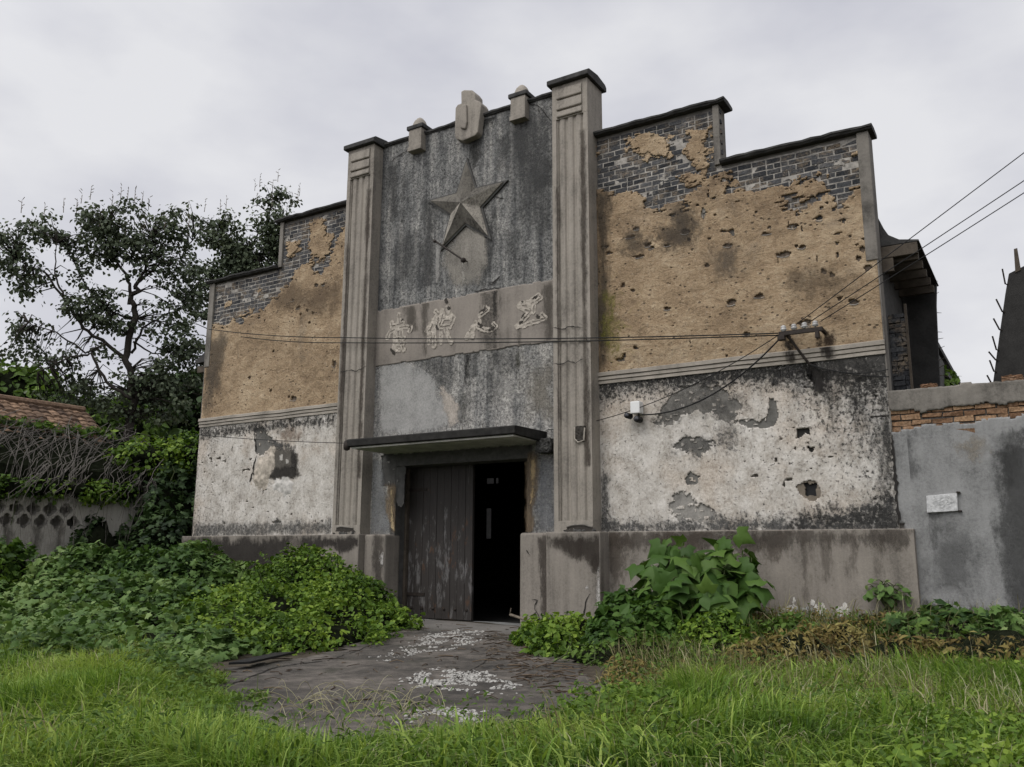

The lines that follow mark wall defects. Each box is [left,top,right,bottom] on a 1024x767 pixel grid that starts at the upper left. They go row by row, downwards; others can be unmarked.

water stain [469,116,495,167]
peeling [597,109,860,245]
water stain [497,112,561,340]
peeling [214,209,346,329]
water stain [537,130,908,615]
spalling [255,427,274,455]
peeling [673,436,716,458]
peeling [653,382,779,432]
spalling [891,401,1024,433]
peeling [669,471,716,524]
spalling [796,480,821,501]
water stain [187,519,358,579]